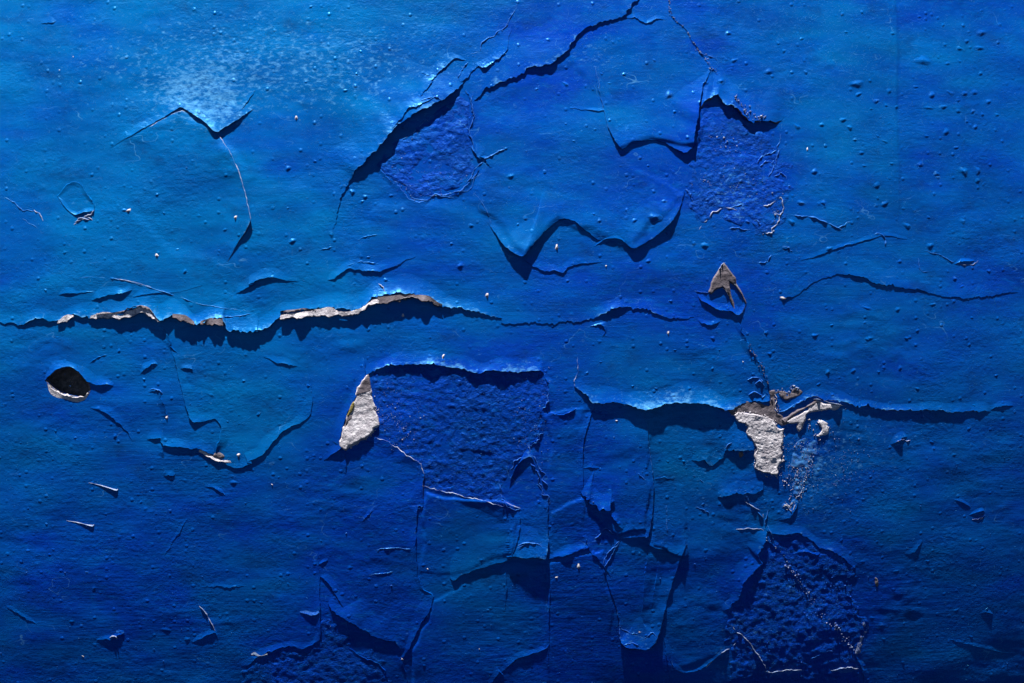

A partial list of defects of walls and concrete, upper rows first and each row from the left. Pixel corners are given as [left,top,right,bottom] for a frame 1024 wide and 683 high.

peeling [312,0,666,233]
peeling [489,66,794,273]
spalling [44,360,114,402]
crack [91,405,134,442]
crack [0,273,695,374]
peeling [323,349,688,650]
crack [499,372,624,584]
peeling [574,356,843,498]
crack [779,249,1018,299]
crack [488,637,550,683]
crack [663,627,761,682]
peeling [721,524,869,683]